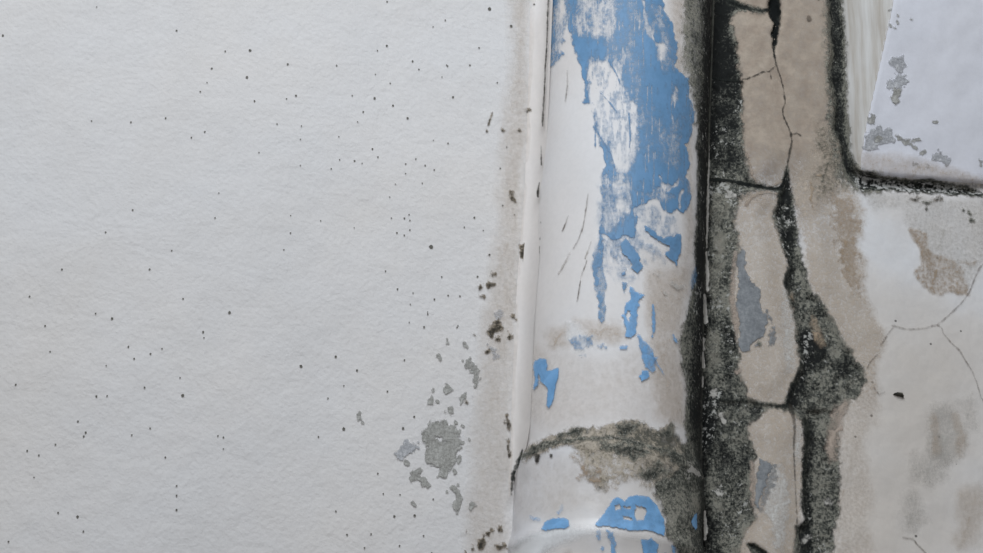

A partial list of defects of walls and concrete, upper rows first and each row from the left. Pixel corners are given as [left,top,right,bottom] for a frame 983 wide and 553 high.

peeling [550,0,695,381]
crack [709,0,801,190]
flaking render [887,55,909,105]
flaking render [862,113,951,168]
damp [504,0,983,553]
flaking render [735,250,794,367]
flaking render [394,341,481,514]
peeling [541,518,569,531]
peeling [595,495,665,553]